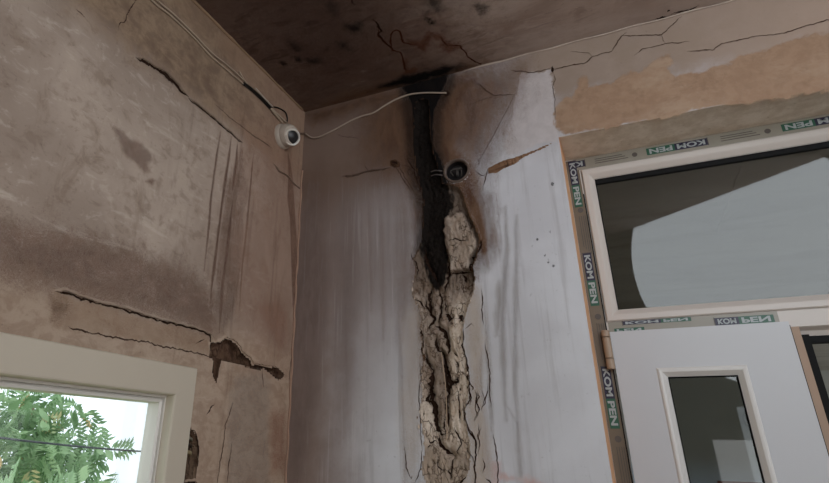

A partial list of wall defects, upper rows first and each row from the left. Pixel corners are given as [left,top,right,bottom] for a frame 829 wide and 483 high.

crack [136,55,301,189]
damp [195,0,524,110]
crack [373,20,411,72]
peeling [488,30,829,174]
crack [511,6,828,113]
crack [55,287,213,357]
damp [0,105,428,483]
spalling [411,99,482,483]
damp [459,207,552,483]
crack [185,403,233,483]